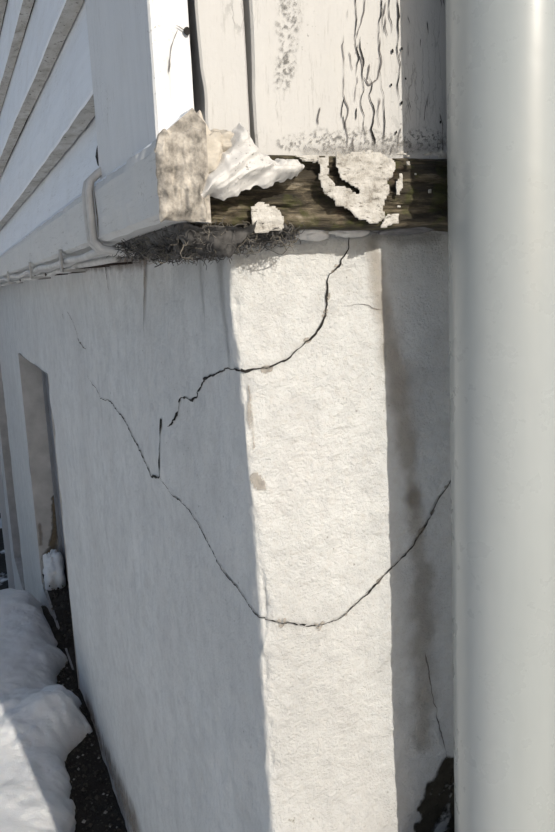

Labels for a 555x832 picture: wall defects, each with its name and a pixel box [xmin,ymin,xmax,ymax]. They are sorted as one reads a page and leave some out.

crack [341,0,443,155]
peeling [251,202,284,233]
peeling [295,150,417,228]
crack [87,240,451,631]
peeling [413,757,455,832]